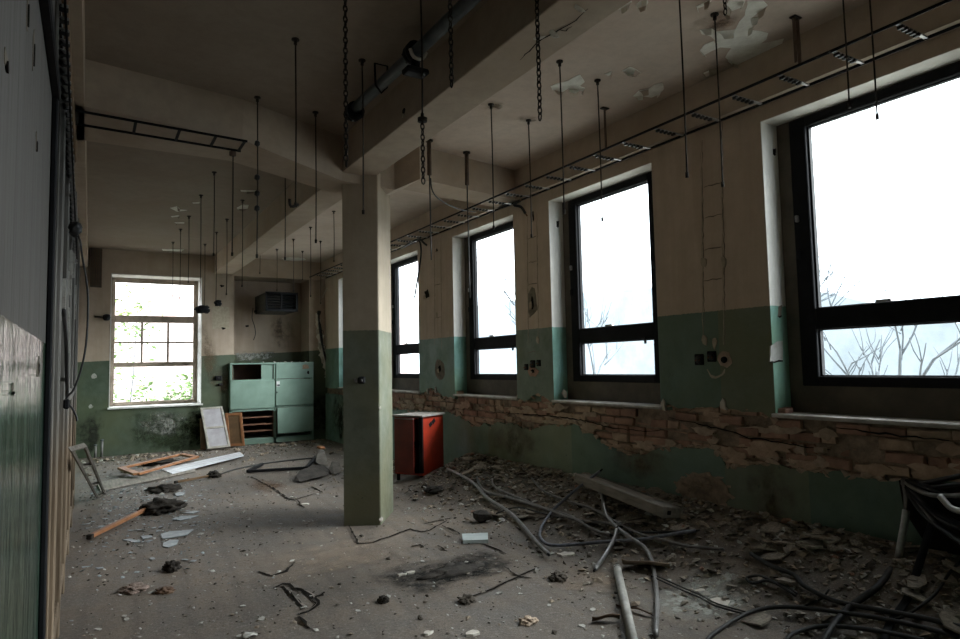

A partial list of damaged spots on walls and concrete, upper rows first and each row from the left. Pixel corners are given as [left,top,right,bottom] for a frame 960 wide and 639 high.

peeling [700,0,784,69]
peeling [551,74,585,95]
leakage [134,406,202,450]
flaking render [379,359,960,482]